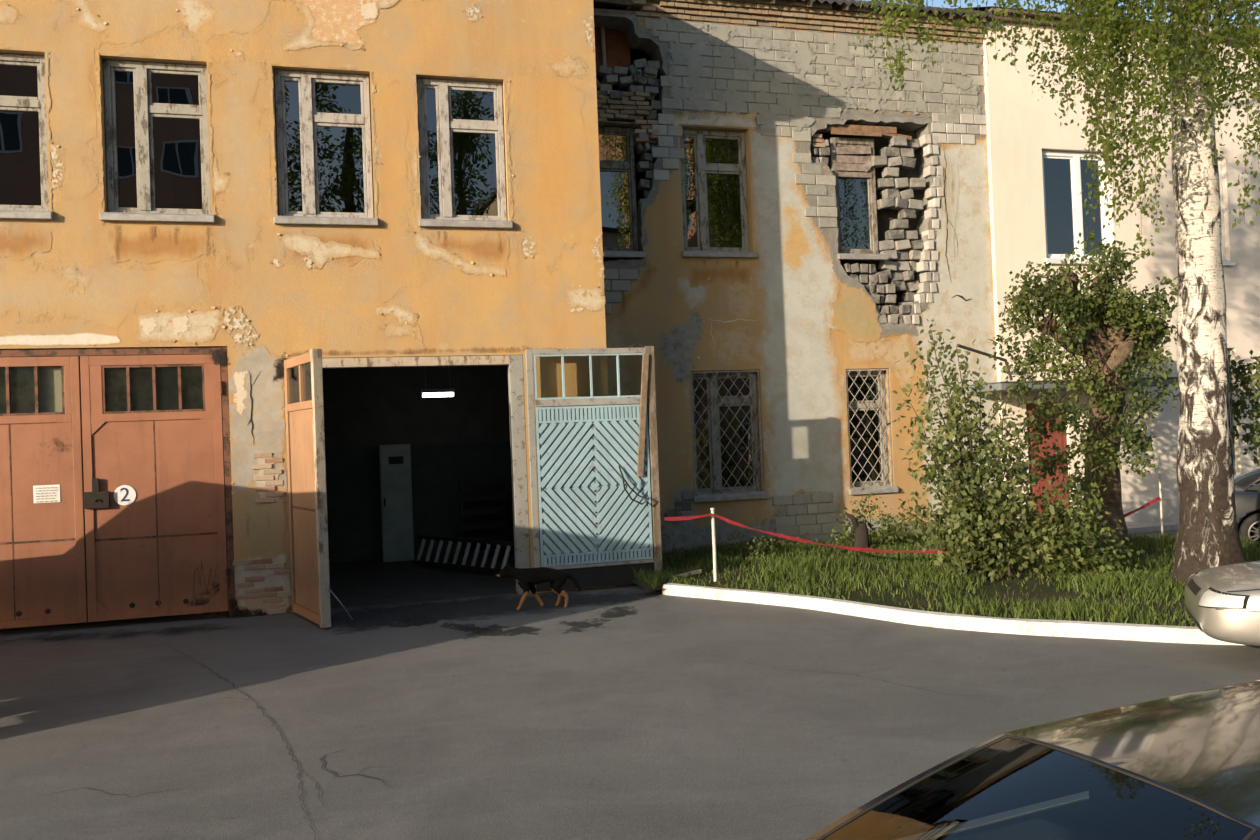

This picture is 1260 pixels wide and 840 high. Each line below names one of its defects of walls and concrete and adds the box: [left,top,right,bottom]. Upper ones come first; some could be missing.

peeling [174,0,217,34]
peeling [282,0,399,66]
leakage [0,0,278,331]
peeling [269,63,381,270]
peeling [411,73,506,278]
spalling [548,5,675,300]
spalling [0,332,121,346]
spalling [136,305,288,503]
crack [248,371,261,445]
peeling [625,276,712,389]
peeling [745,108,1000,524]
flaking render [233,553,292,614]